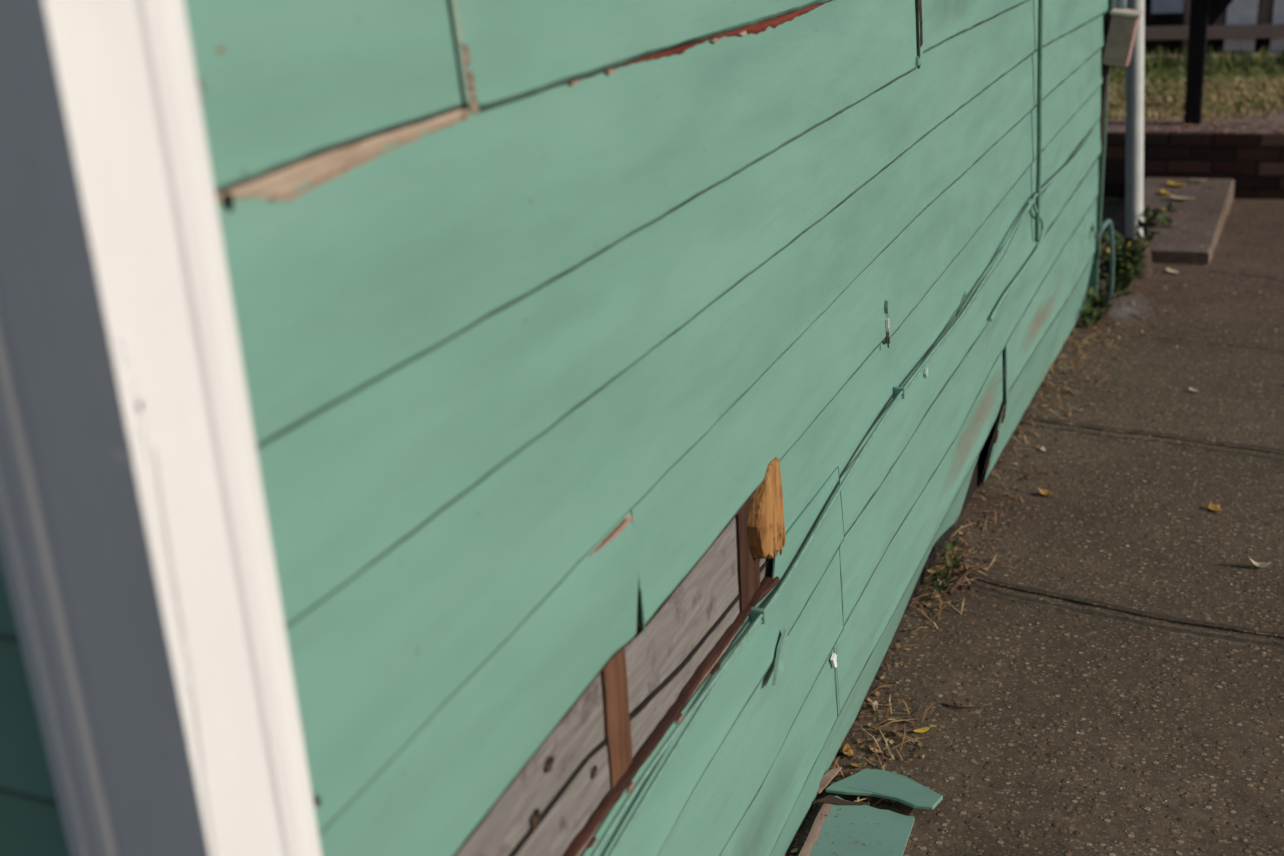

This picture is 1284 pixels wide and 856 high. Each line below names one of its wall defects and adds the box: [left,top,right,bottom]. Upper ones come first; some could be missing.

peeling [562,0,832,86]
peeling [215,106,469,211]
peeling [589,514,633,556]
crack [638,576,646,636]